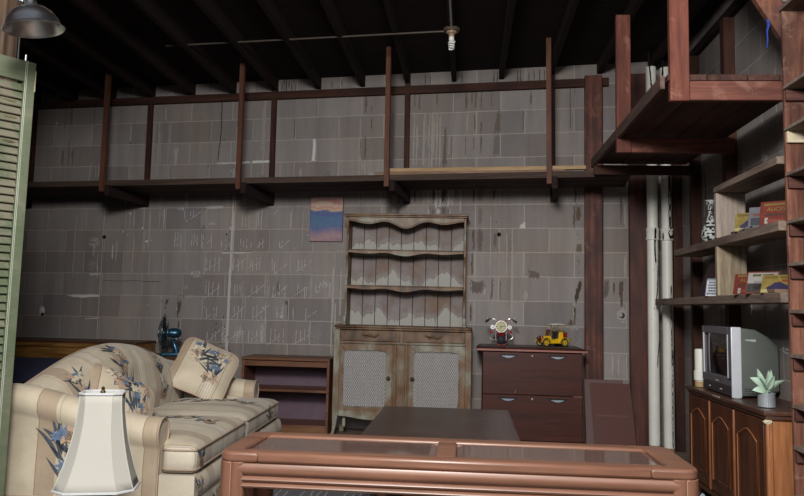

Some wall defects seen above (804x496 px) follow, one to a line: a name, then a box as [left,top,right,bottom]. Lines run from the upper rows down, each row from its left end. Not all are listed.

leakage [412,112,450,168]